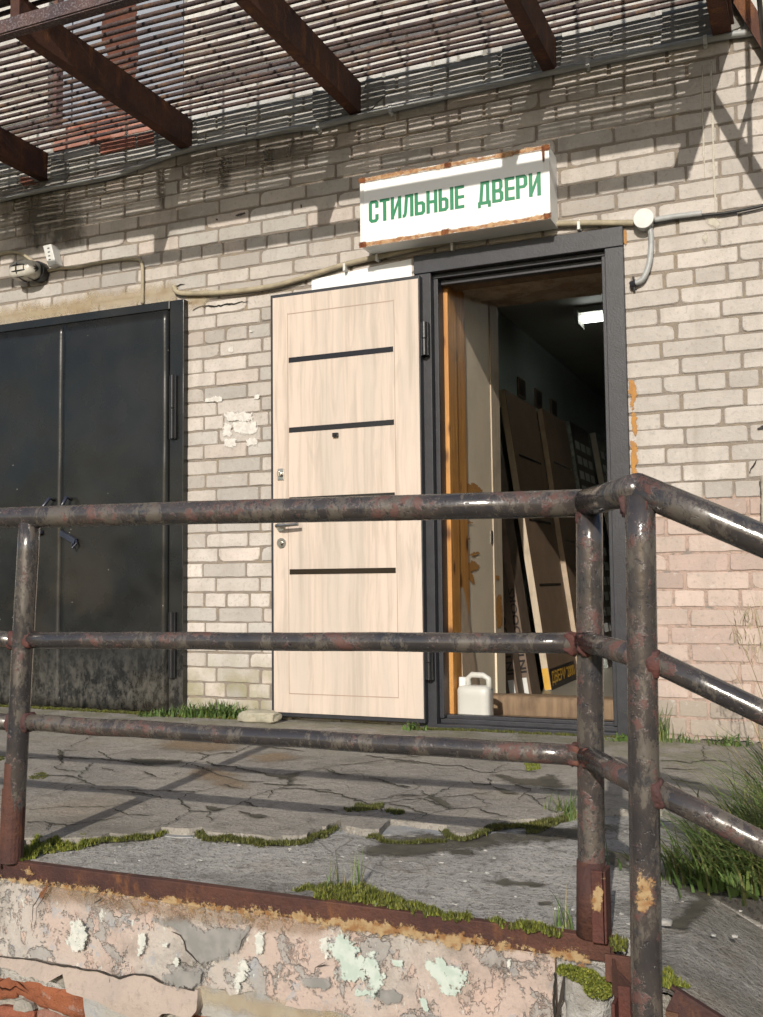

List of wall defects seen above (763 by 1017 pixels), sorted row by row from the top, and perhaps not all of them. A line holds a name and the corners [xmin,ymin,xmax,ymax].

corrosion [358,144,550,183]
corrosion [359,212,551,248]
crack [663,735,763,783]
crack [27,737,573,829]
spalling [491,878,545,887]
peeling [65,917,90,952]
peeling [137,933,147,956]
spalling [0,968,128,1017]
peeling [300,931,404,1005]
peeling [419,997,439,1017]
peeling [425,957,469,997]
crack [552,972,565,1017]